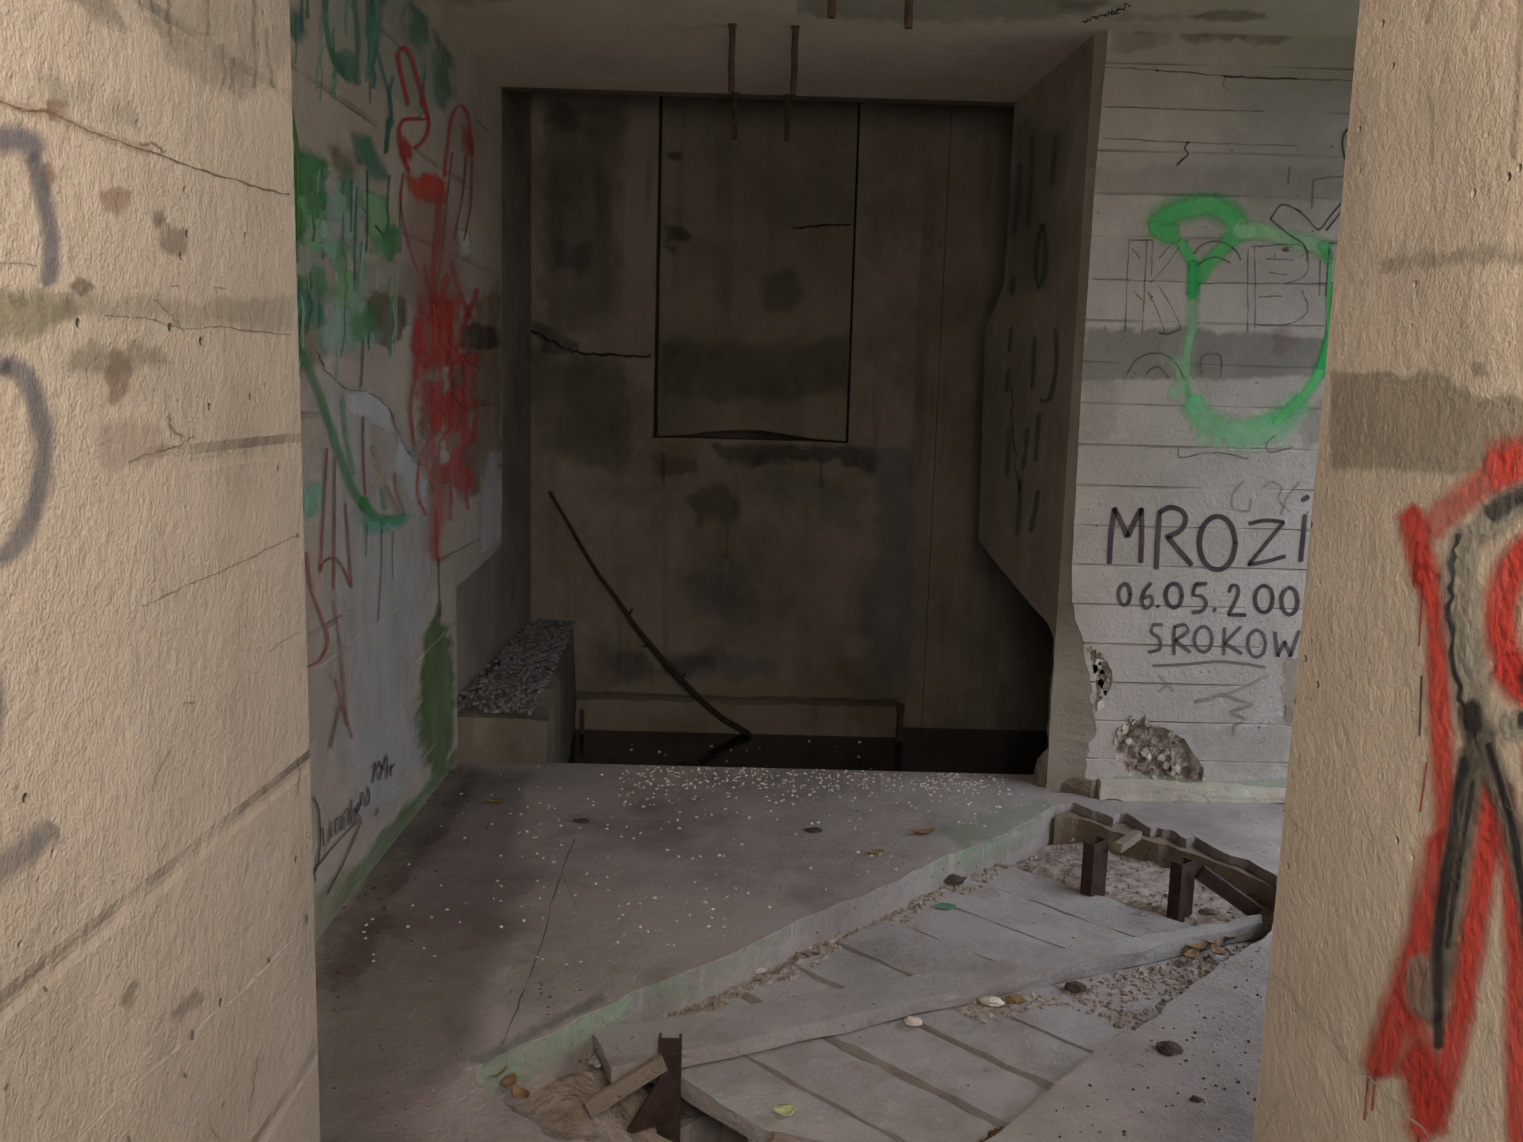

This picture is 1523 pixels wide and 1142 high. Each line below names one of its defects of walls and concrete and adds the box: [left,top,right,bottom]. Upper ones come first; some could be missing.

crack [0,100,290,195]
crack [793,222,851,230]
crack [106,315,291,335]
crack [531,330,651,358]
crack [142,535,300,607]
spalling [1088,647,1112,711]
spalling [1113,715,1206,783]
crack [503,839,575,1043]